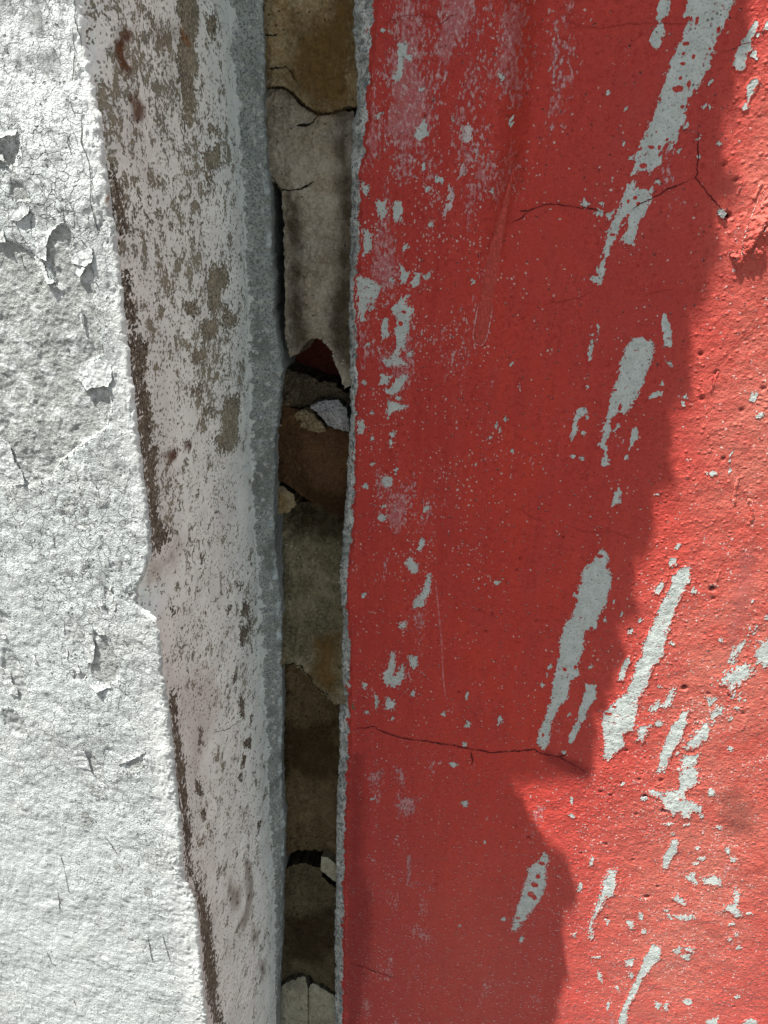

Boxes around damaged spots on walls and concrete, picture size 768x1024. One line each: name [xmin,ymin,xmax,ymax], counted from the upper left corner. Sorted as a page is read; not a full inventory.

crack [266,66,352,127]
crack [513,203,605,222]
peeling [580,0,738,288]
crack [631,132,721,211]
peeling [730,18,768,113]
peeling [0,181,112,487]
peeling [353,243,431,448]
peeling [567,311,674,468]
crack [364,726,588,773]
peeling [535,543,768,869]
peeling [501,851,552,942]
peeling [606,912,697,1024]